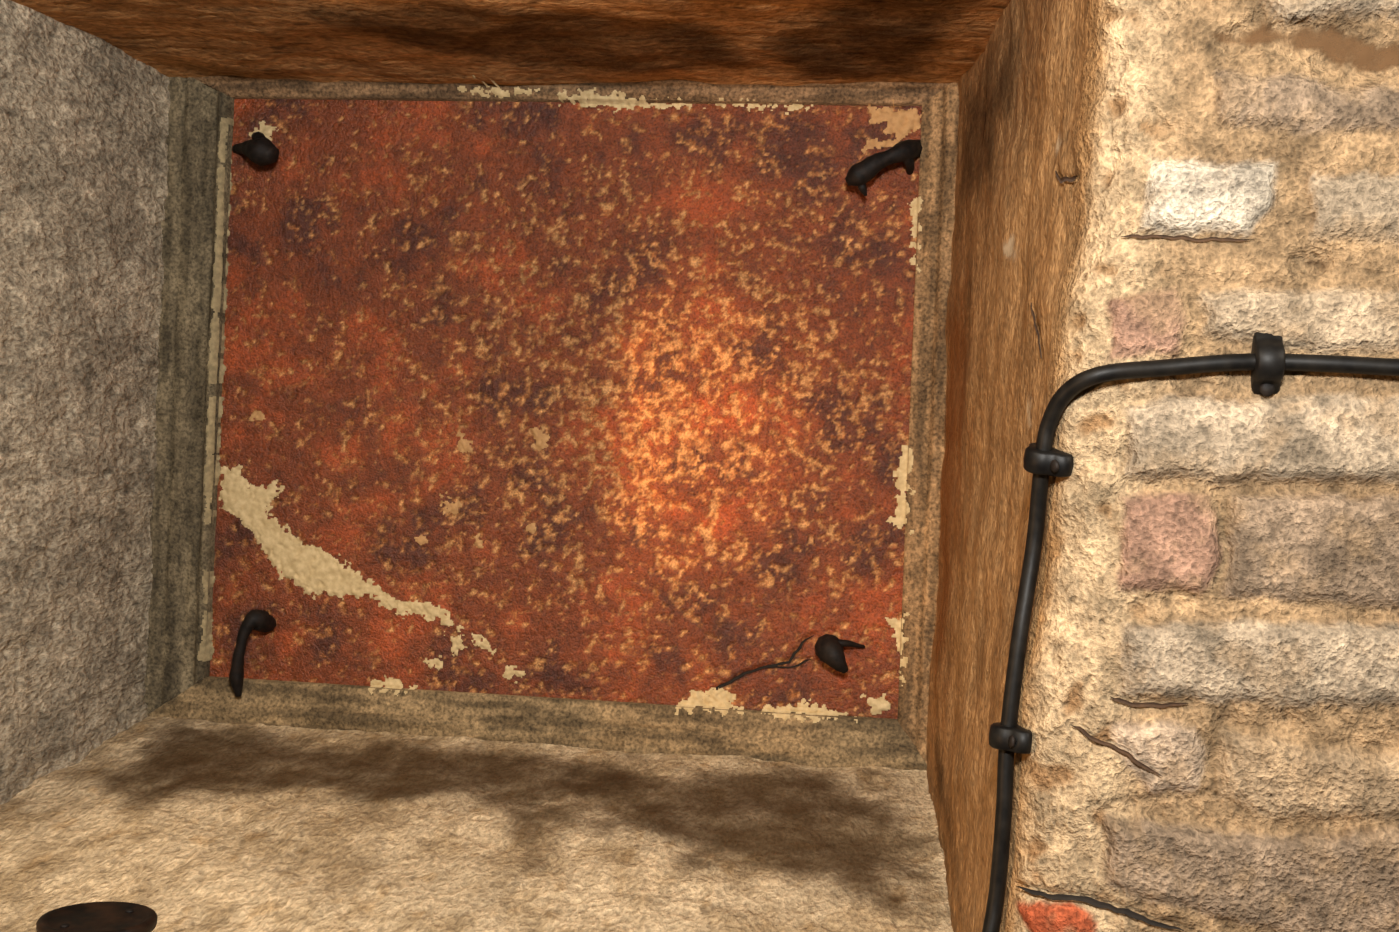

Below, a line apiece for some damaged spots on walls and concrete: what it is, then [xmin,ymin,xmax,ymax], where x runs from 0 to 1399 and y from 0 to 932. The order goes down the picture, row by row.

water stain [377,10,665,72]
peeling [203,117,526,684]
peeling [530,426,550,451]
peeling [197,569,216,662]
peeling [368,675,418,696]
crack [706,635,814,696]
water stain [109,728,898,910]
crack [1016,886,1184,931]